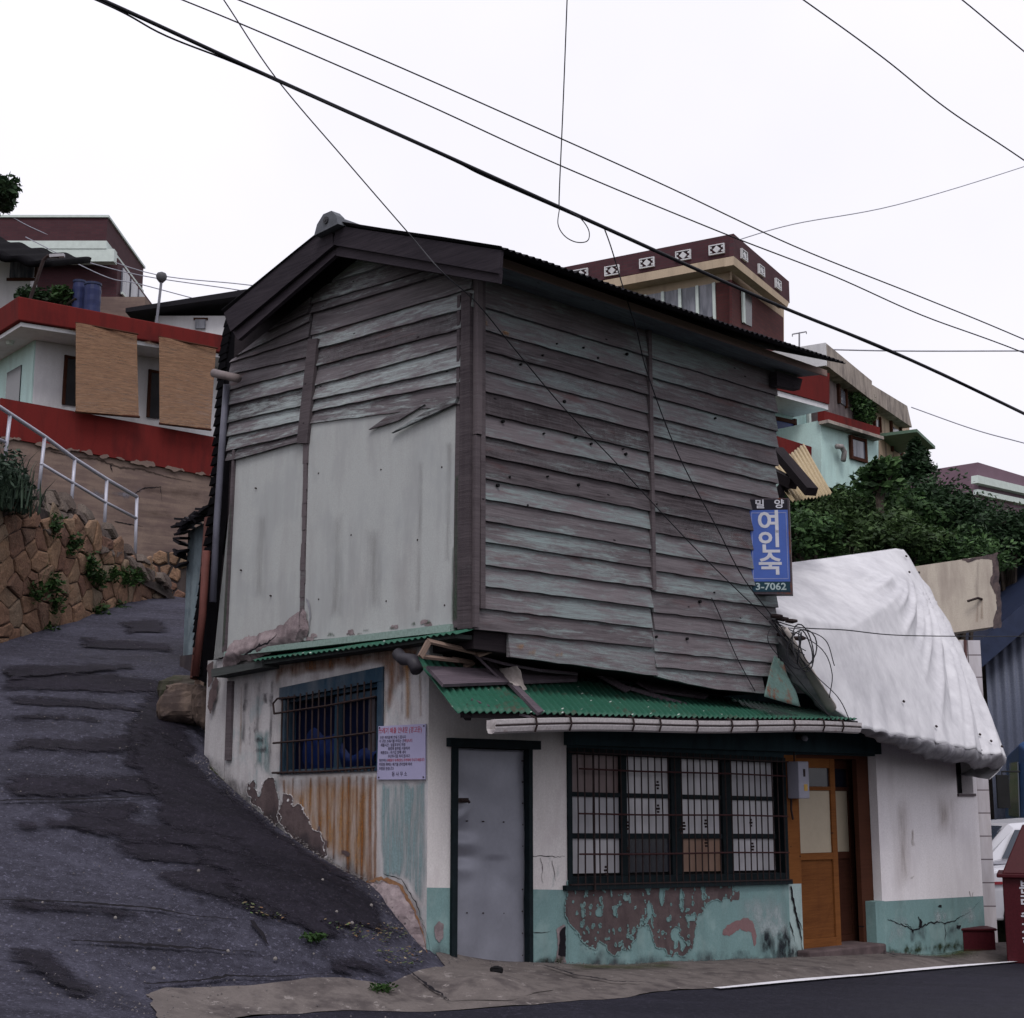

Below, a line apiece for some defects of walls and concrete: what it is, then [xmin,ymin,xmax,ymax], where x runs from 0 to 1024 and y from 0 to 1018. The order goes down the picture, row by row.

peeling [246,777,328,860]
corrosion [284,777,376,880]
flaking render [366,874,444,952]
peeling [554,880,740,963]
crack [891,891,978,937]